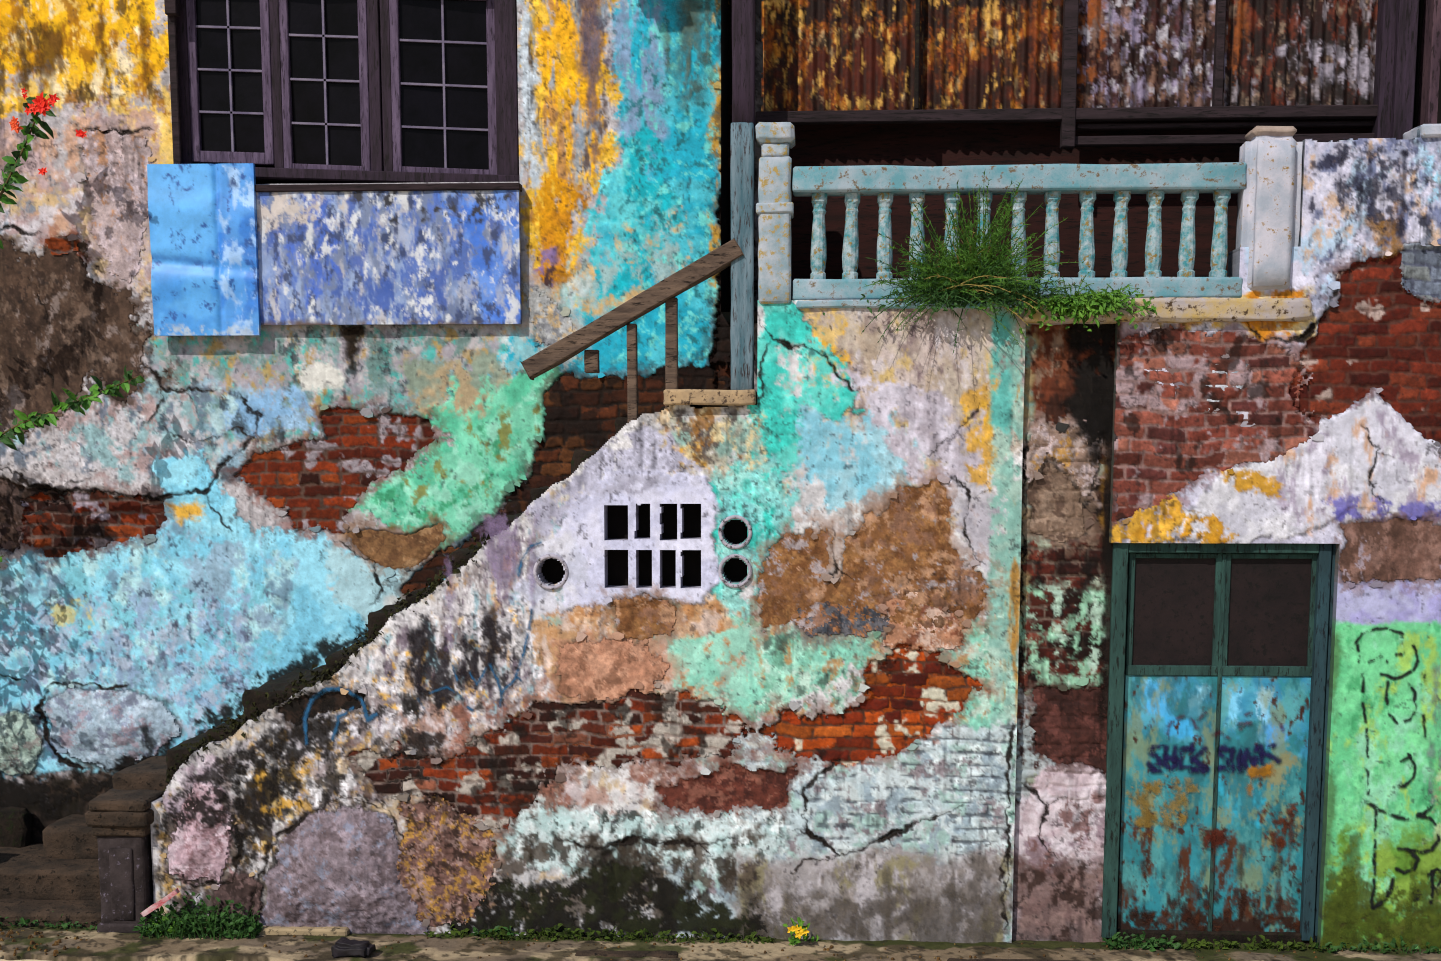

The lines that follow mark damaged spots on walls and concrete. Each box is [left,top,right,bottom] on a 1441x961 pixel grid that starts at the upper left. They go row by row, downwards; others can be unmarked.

crack [757,332,857,405]
flaking render [1022,238,1441,524]
flaking render [15,489,167,558]
crack [0,362,263,530]
flaking render [234,405,438,534]
flaking render [348,475,989,831]
crack [0,674,128,770]
damp [446,843,1006,944]
crack [790,759,962,874]
corrosion [1126,778,1305,933]